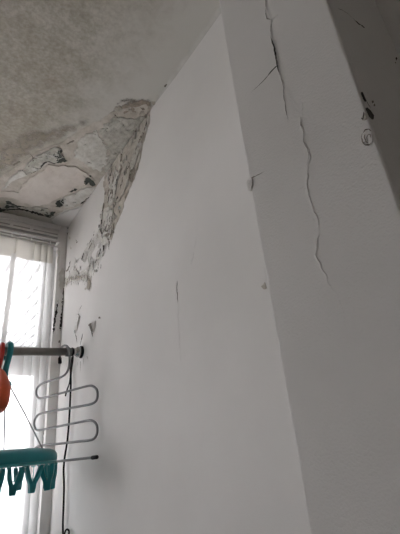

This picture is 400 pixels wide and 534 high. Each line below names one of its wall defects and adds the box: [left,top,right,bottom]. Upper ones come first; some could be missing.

peeling [0,102,155,333]
crack [247,171,265,191]
crack [256,0,346,328]